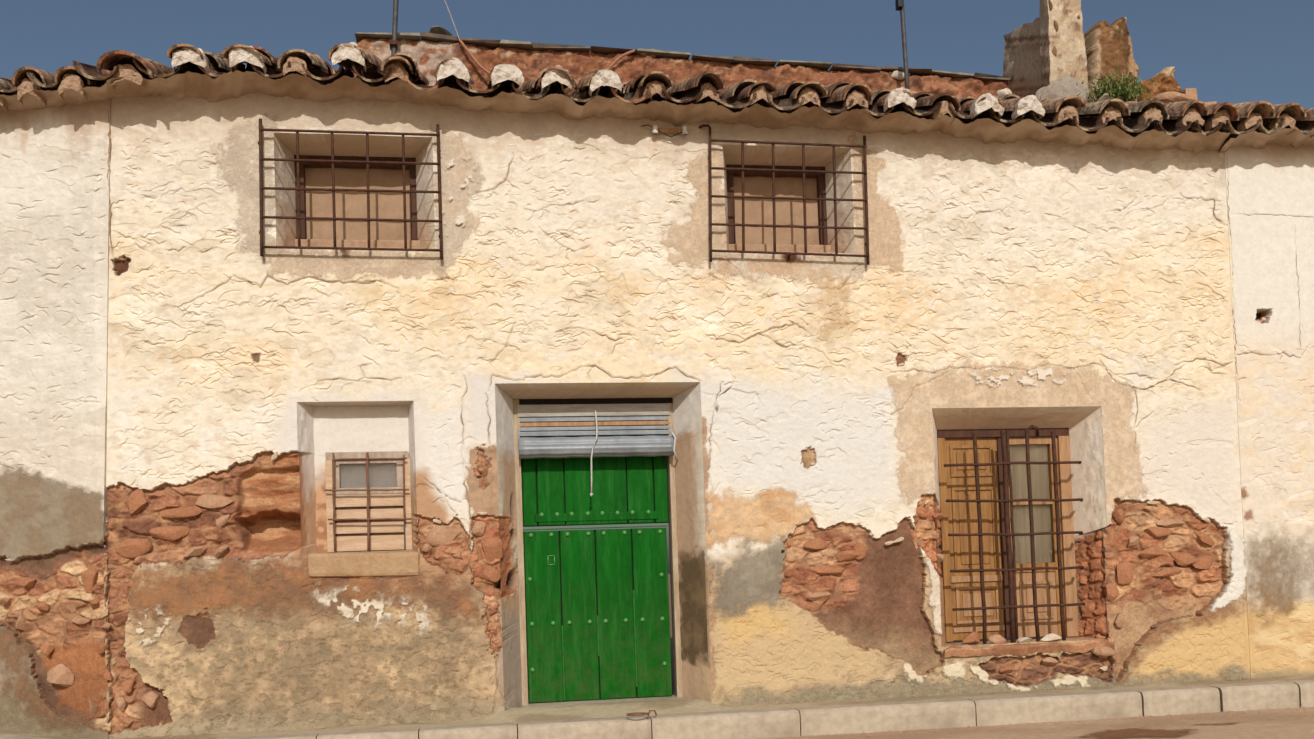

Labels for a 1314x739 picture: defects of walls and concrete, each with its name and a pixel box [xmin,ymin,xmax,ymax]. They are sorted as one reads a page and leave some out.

crack [105,110,113,250]
crack [196,275,398,299]
crack [317,365,392,384]
crack [711,324,842,367]
leakage [0,467,108,560]
spalling [0,452,301,733]
peeling [314,586,429,635]
spalling [417,445,503,657]
spalling [779,354,1247,691]
leakage [1249,537,1314,613]
leakage [0,628,83,735]